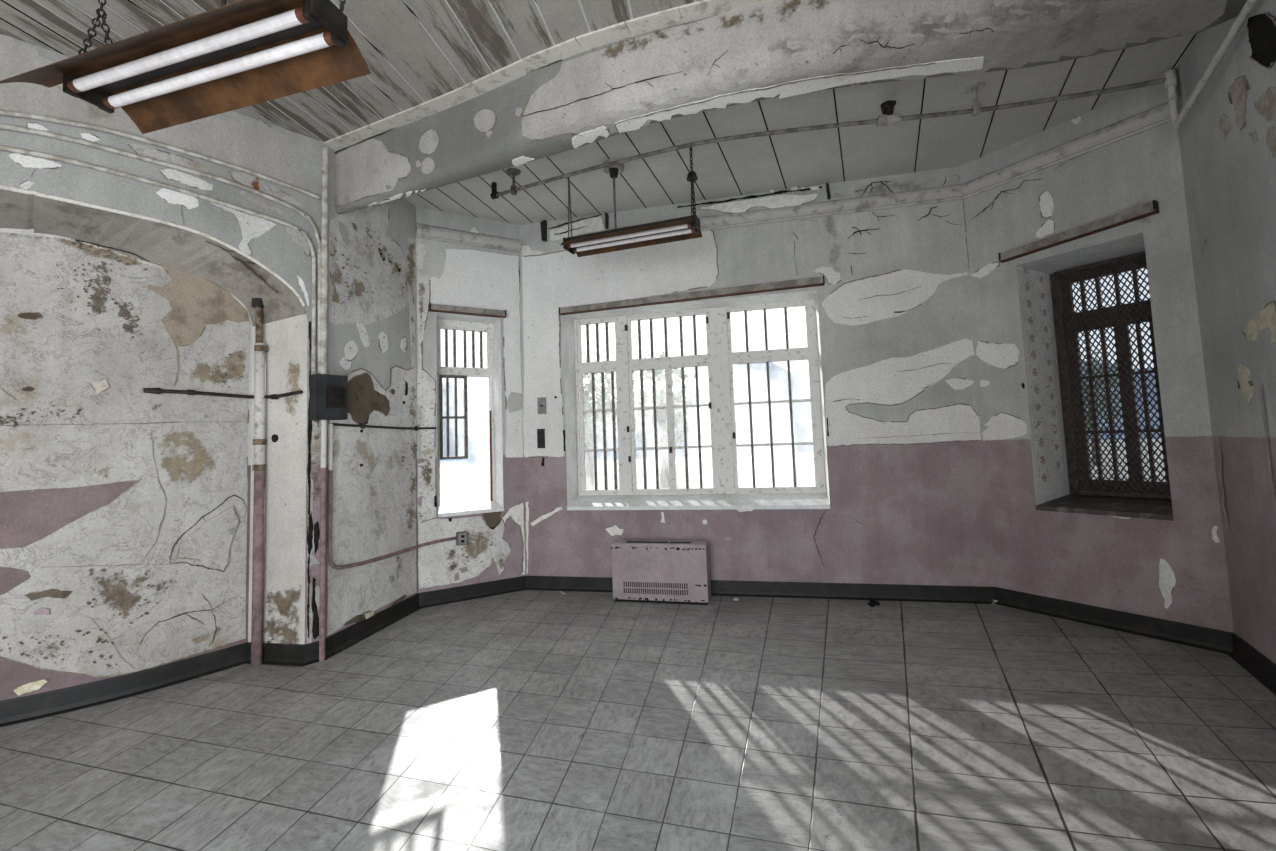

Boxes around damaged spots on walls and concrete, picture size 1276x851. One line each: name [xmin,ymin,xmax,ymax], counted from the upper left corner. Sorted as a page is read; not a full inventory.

peeling [0,34,309,192]
peeling [514,0,1228,149]
peeling [156,169,311,257]
crack [847,150,1093,275]
peeling [813,262,1000,326]
crack [0,388,86,426]
peeling [0,232,251,696]
peeling [306,129,719,644]
peeling [825,339,1027,446]
crack [66,422,247,670]
crack [813,504,867,566]
peeling [1159,559,1176,609]